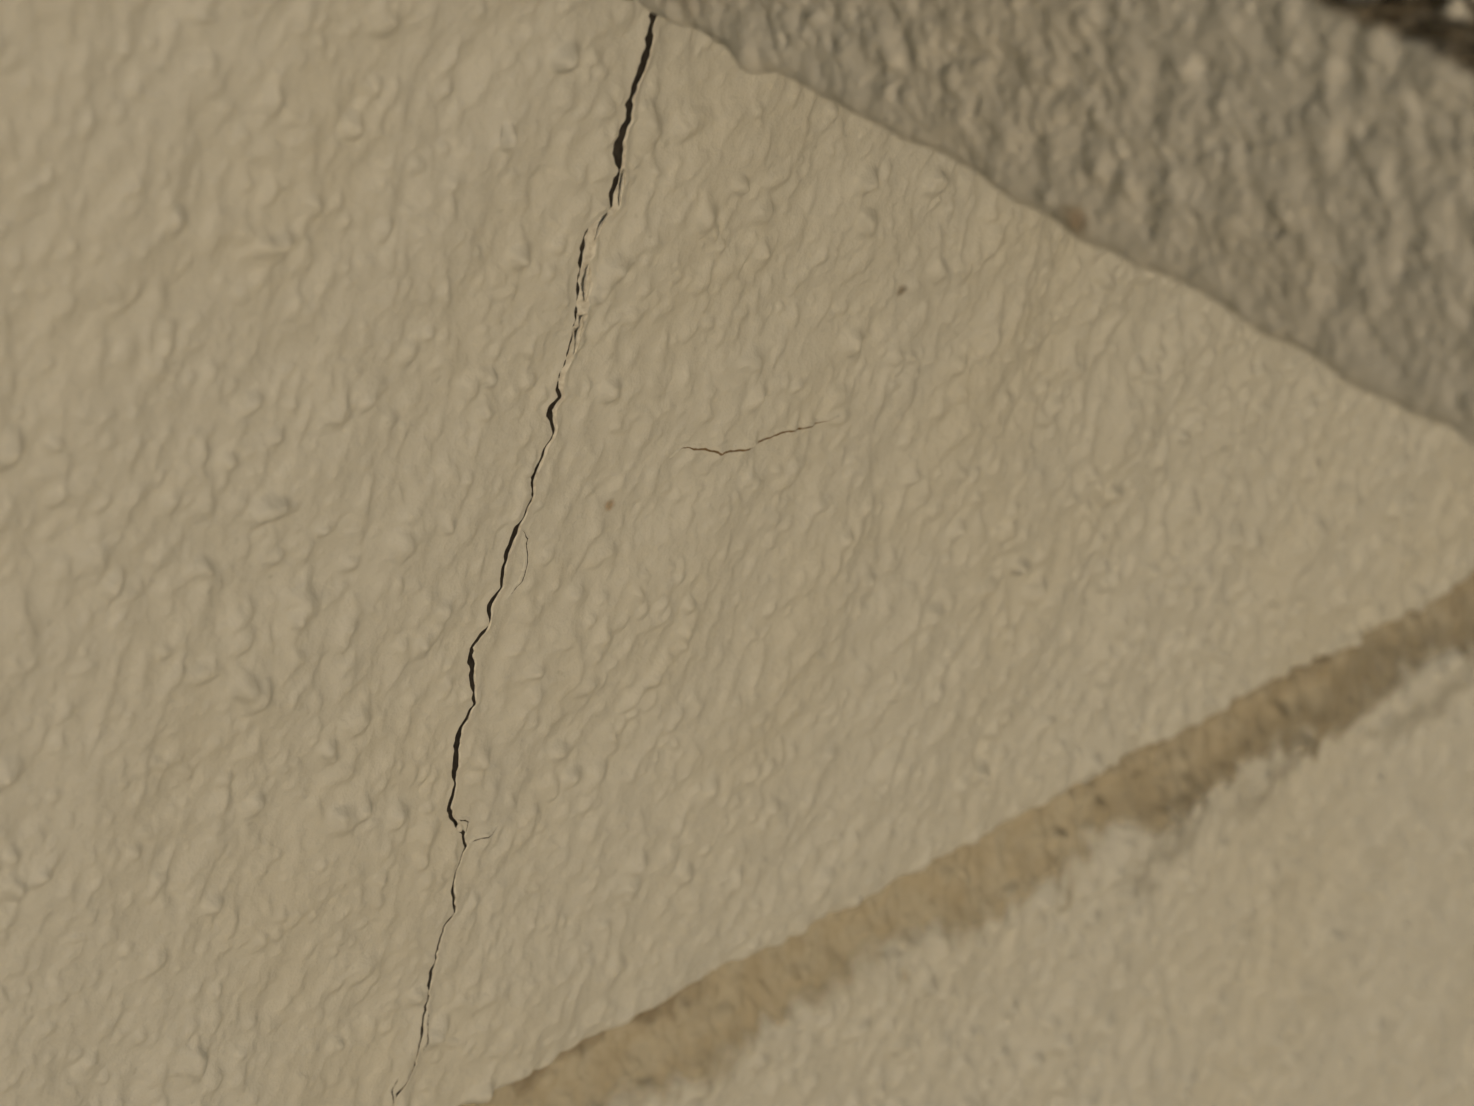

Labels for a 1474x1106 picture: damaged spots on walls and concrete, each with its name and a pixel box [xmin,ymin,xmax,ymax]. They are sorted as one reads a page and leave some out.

crack [387,12,658,1106]